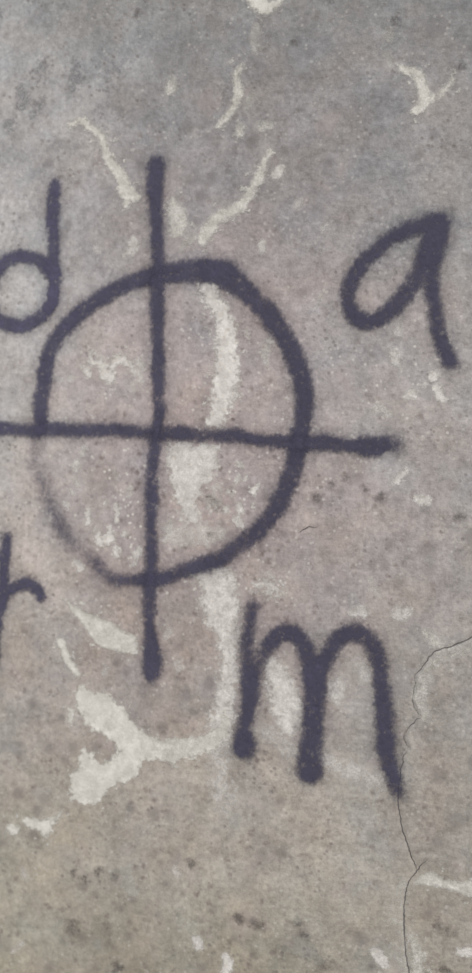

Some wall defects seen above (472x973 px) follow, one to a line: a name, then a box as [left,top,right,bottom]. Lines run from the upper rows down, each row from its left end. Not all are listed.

crack [398,636,472,973]